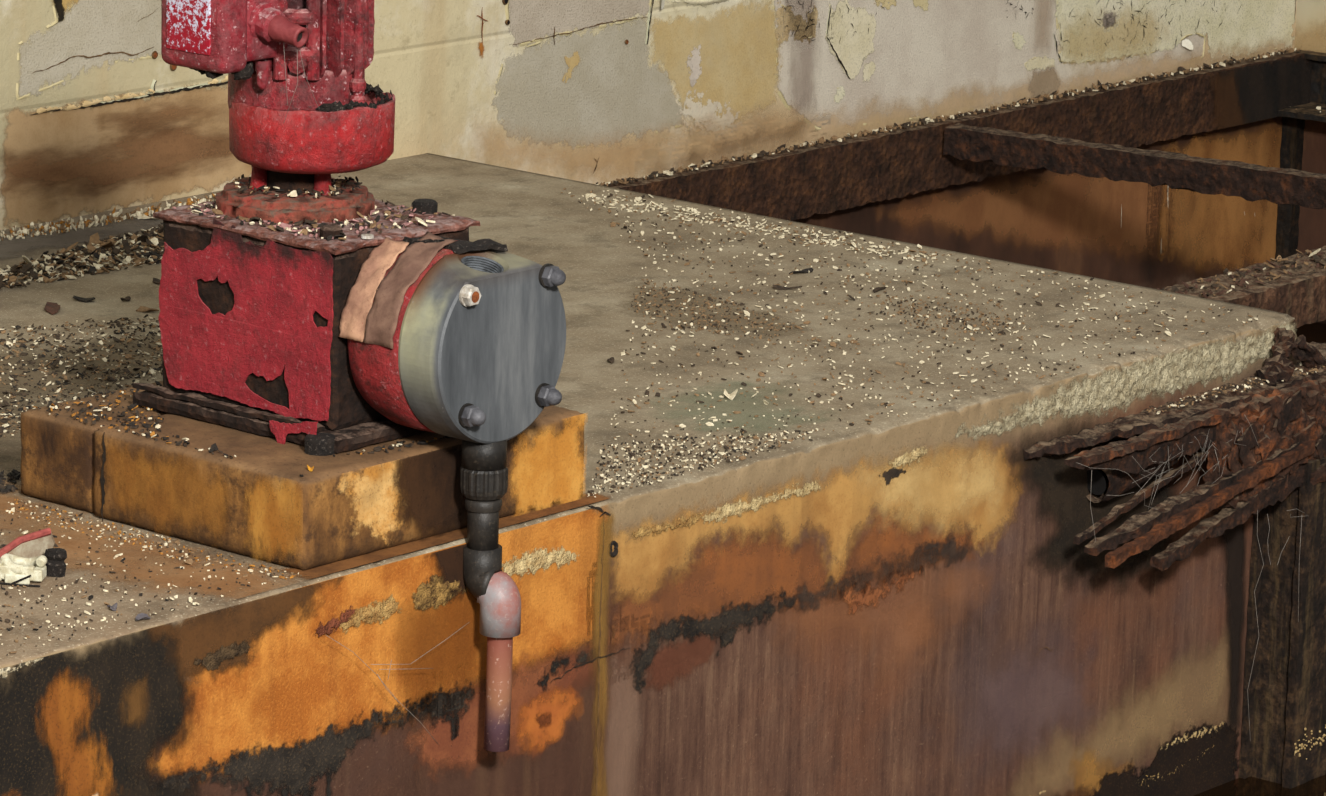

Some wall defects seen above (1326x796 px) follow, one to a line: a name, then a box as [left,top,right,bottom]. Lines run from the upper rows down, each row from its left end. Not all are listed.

peeling [16,0,177,100]
damp [0,84,252,260]
crack [477,0,654,45]
peeling [492,0,742,150]
crack [777,0,885,79]
peeling [772,0,1206,131]
rust [896,173,1278,270]
crack [1007,0,1242,63]
rust [1166,73,1282,168]
spalling [956,323,1295,440]
rust [0,460,487,796]
rust [498,413,1022,754]